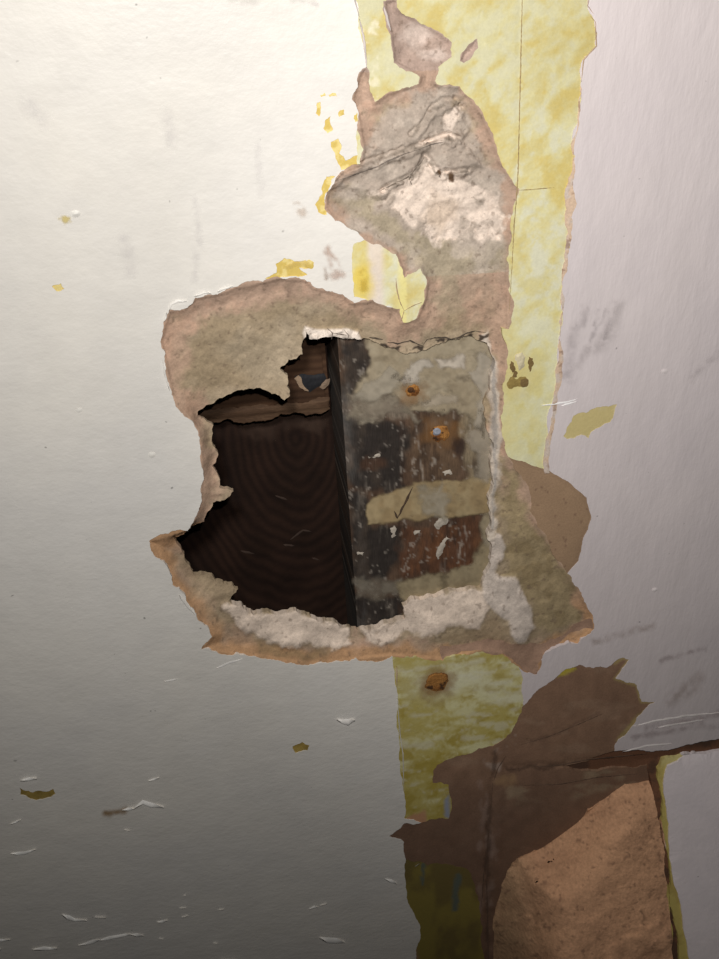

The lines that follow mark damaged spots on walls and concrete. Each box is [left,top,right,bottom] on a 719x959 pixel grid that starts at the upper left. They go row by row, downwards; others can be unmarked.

spalling [150,0,689,959]
corrosion [430,425,450,442]
corrosion [425,672,449,691]
crack [482,713,719,959]